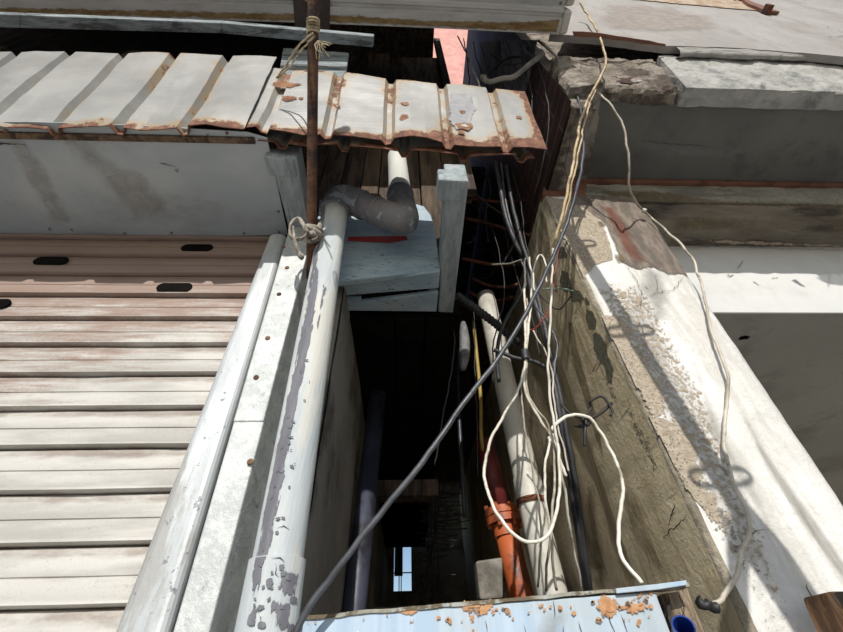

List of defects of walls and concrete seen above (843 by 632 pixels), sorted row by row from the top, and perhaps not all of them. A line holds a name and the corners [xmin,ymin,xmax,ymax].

rust [273,80,304,101]
rust [455,110,473,134]
peeling [546,196,613,279]
crack [628,267,683,343]
peeling [247,241,326,632]
peeling [560,270,778,593]
crack [664,505,687,538]
peeling [437,598,514,632]
peeling [591,591,653,626]